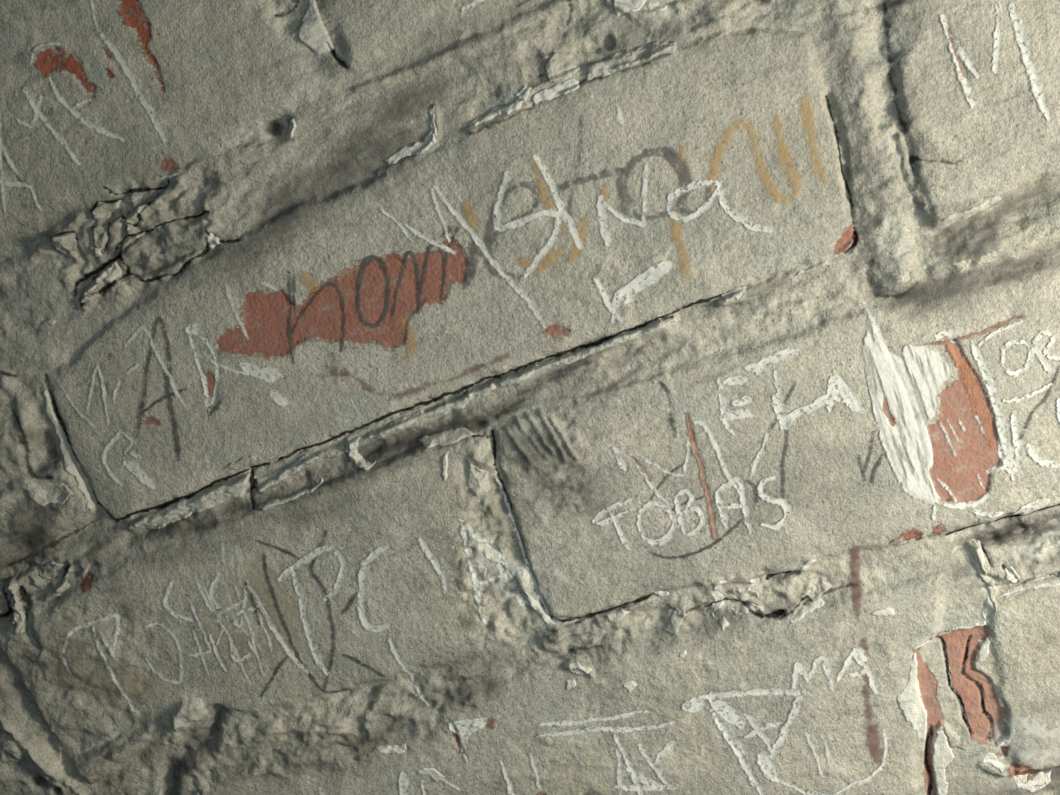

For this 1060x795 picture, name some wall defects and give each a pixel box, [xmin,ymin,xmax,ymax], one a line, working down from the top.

crack [883,3,961,208]
peeling [52,233,78,252]
peeling [81,199,151,303]
peeling [207,233,220,249]
crack [0,285,748,619]
spalling [927,336,1002,503]
crack [472,430,855,652]
spalling [891,525,947,544]
crack [946,504,1060,583]
peeling [869,608,894,617]
spalling [896,539,1060,795]